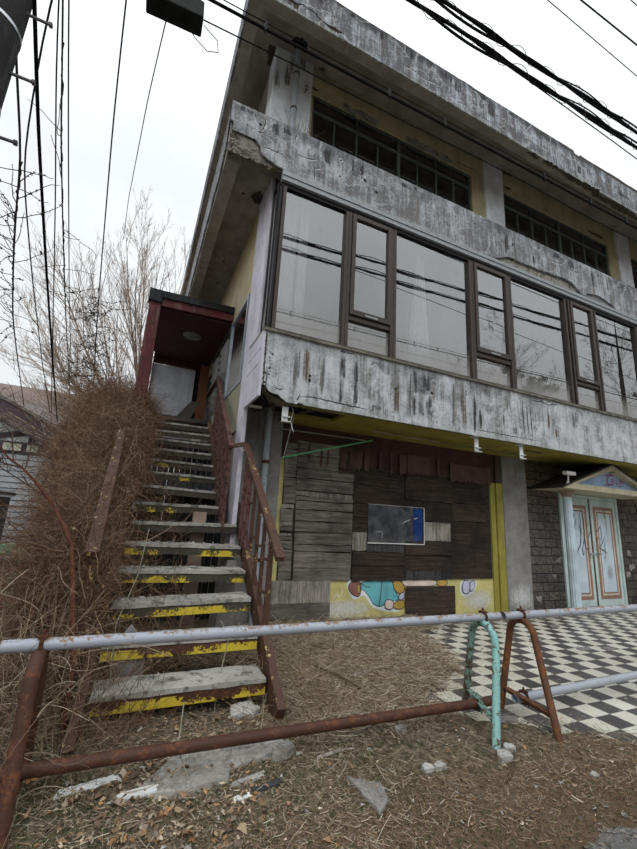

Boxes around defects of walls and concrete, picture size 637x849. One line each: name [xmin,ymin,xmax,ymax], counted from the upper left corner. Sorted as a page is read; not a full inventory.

crack [289,0,336,22]
water stain [267,44,276,67]
spalling [227,121,281,175]
water stain [293,351,309,381]
water stain [340,351,358,405]
water stain [395,370,432,414]
water stain [453,389,482,431]